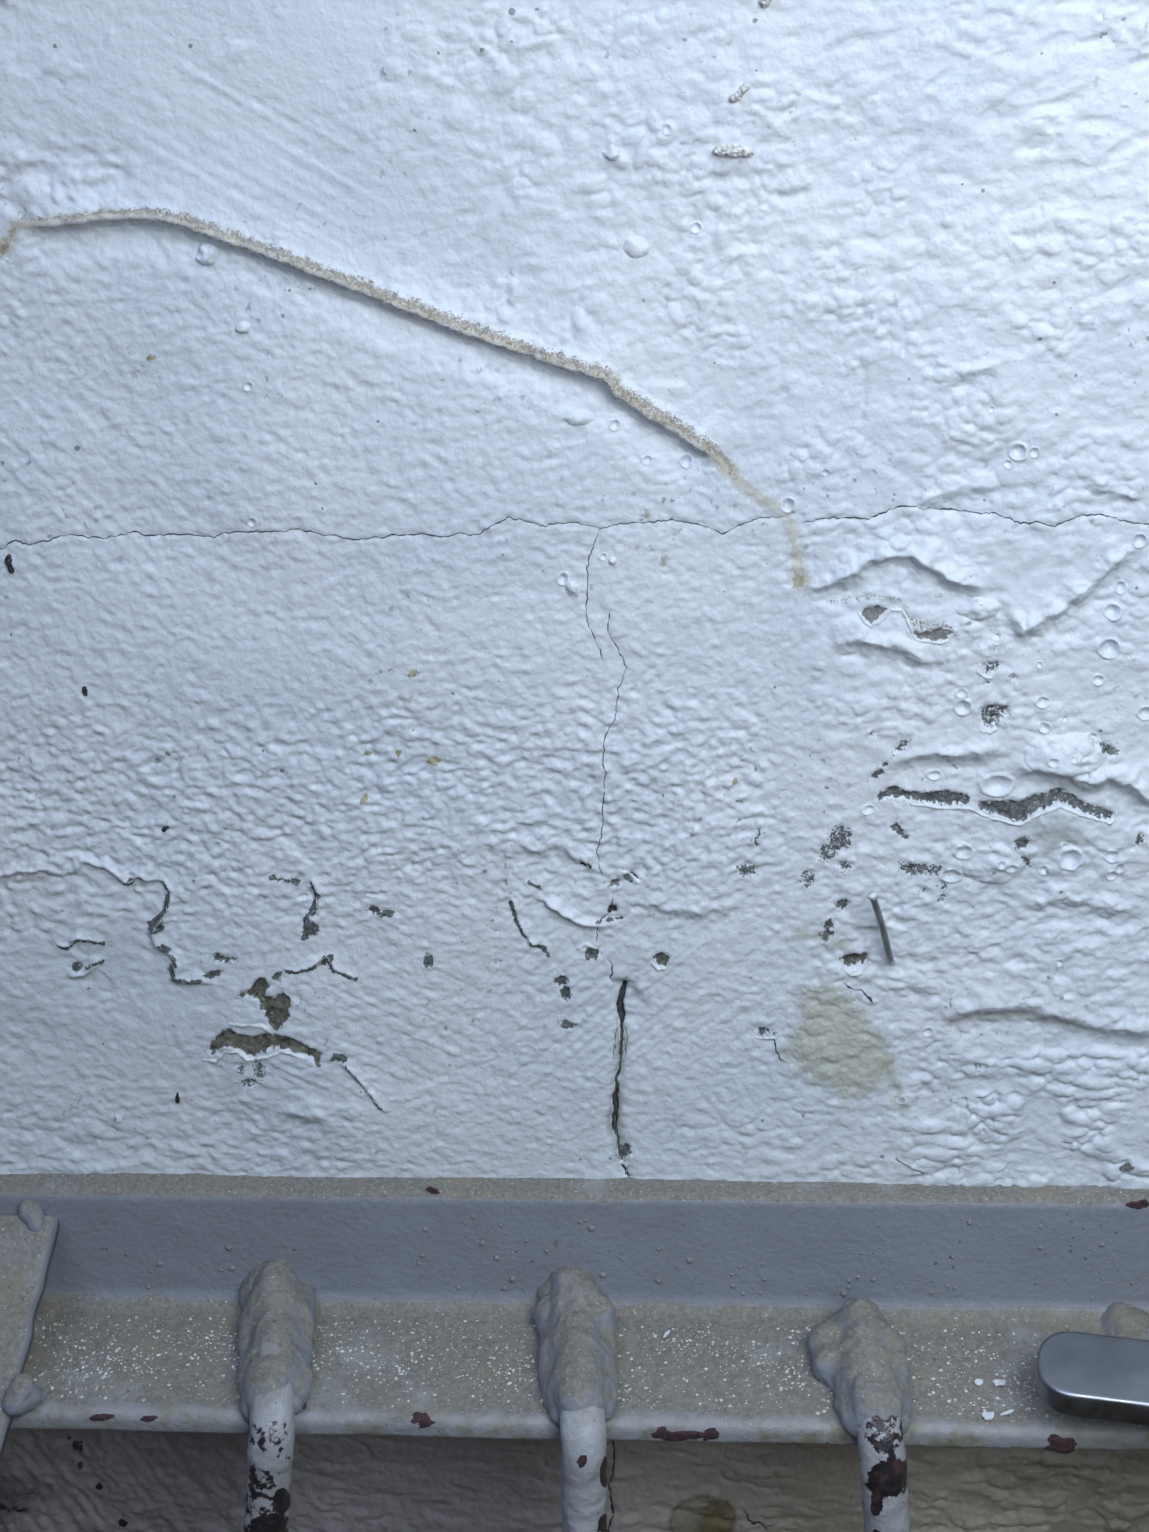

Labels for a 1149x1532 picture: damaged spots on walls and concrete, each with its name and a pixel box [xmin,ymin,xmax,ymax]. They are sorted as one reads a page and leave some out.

peeling [858,605,958,645]
peeling [976,661,1016,683]
peeling [979,704,1011,735]
peeling [868,739,1119,867]
crack [0,505,1149,1177]
peeling [798,823,856,890]
peeling [898,862,949,901]
peeling [818,897,851,942]
peeling [0,851,394,1113]
peeling [841,953,871,977]
damp [791,988,885,1093]